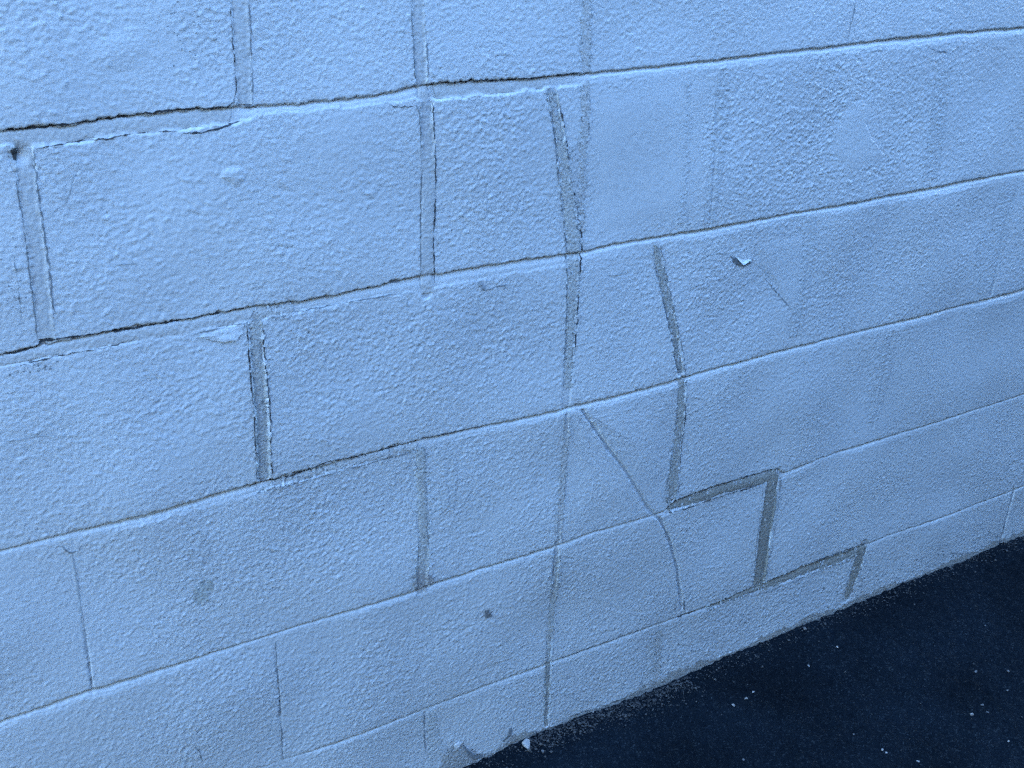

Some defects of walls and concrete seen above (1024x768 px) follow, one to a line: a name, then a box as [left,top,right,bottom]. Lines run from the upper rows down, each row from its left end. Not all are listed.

crack [0,1,630,513]
crack [543,245,867,727]